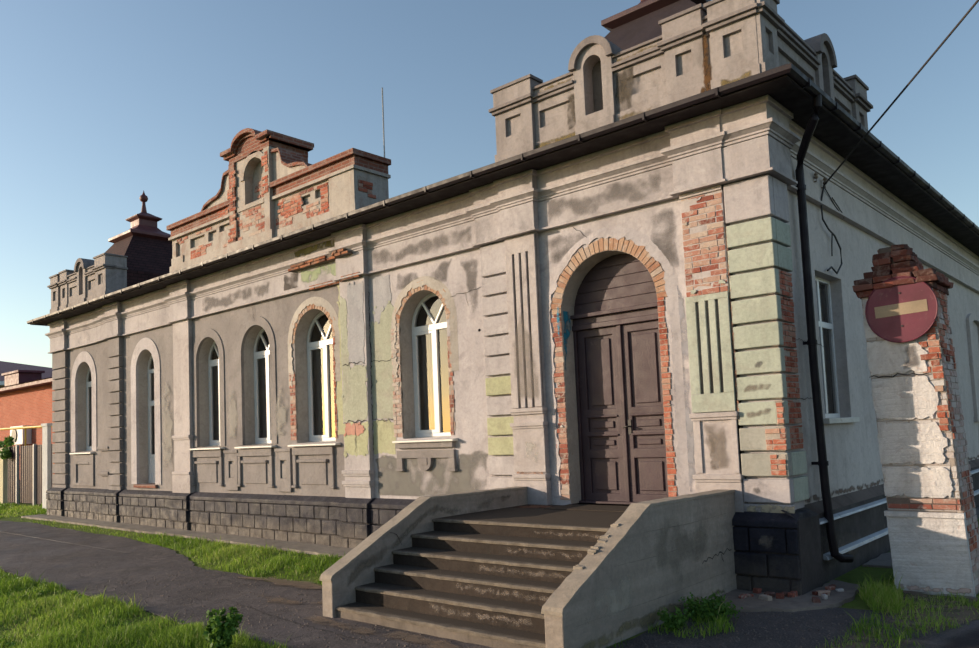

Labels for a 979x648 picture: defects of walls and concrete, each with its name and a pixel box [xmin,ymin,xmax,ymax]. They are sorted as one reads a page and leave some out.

rust [701,36,712,93]
flaking render [177,150,329,260]
flaking render [357,175,376,199]
peeling [288,272,459,458]
flaking render [544,192,731,500]
flaking render [765,268,803,476]
flaking render [919,289,956,439]